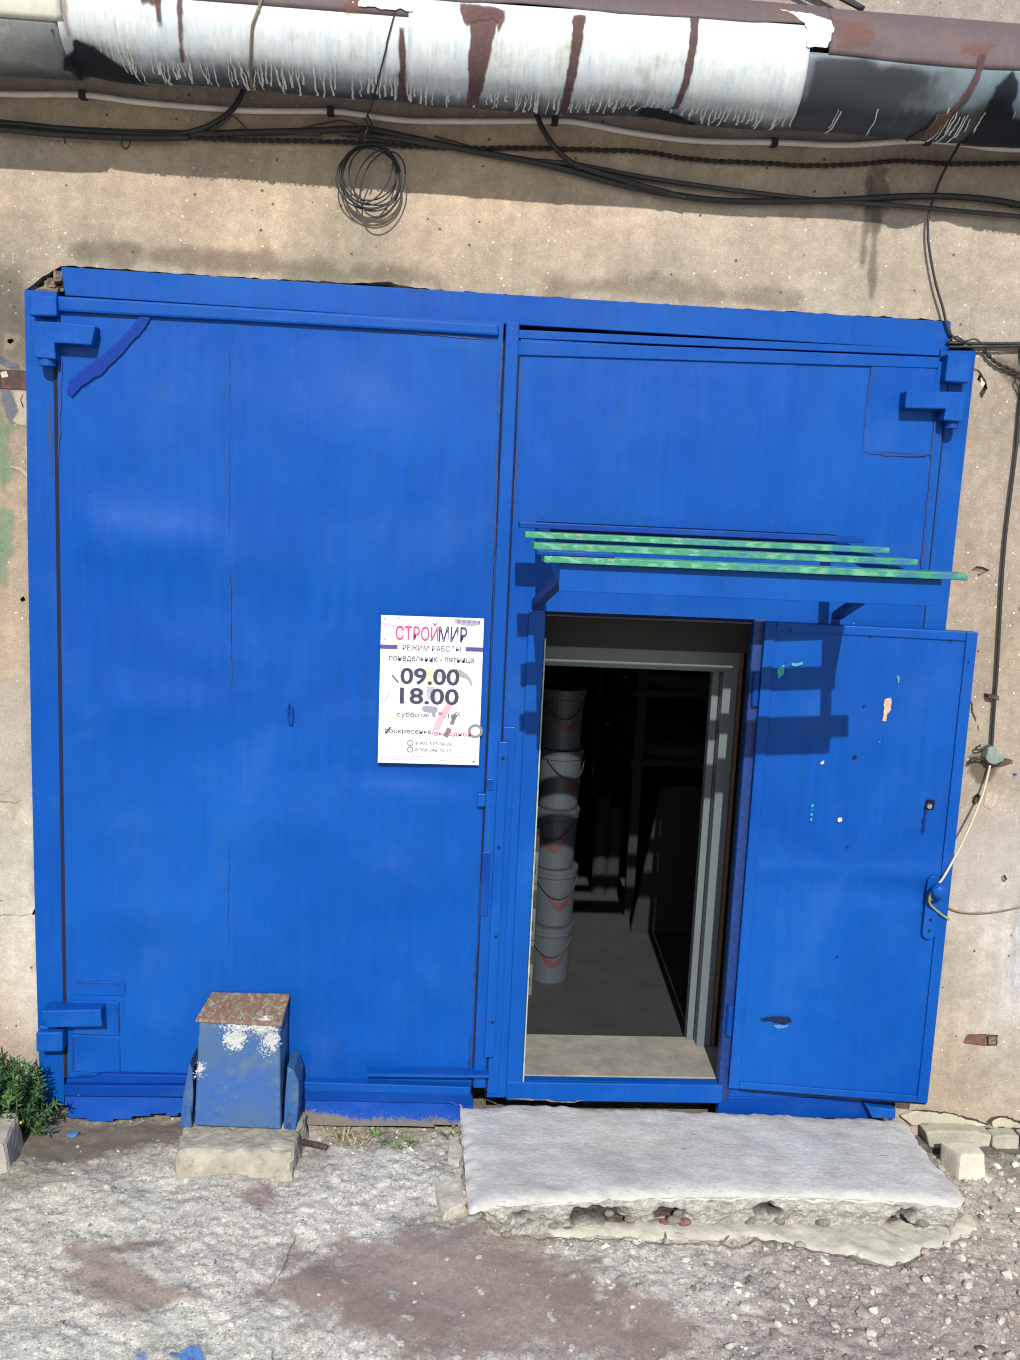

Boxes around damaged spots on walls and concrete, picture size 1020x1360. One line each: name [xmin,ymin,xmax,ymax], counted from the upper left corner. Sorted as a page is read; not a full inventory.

rust [141,0,161,22]
rust [177,0,185,63]
peeling [352,0,414,12]
rust [460,3,505,105]
rust [905,54,986,141]
peeling [882,698,892,721]
spalling [963,1034,998,1046]
spalling [433,1118,965,1239]